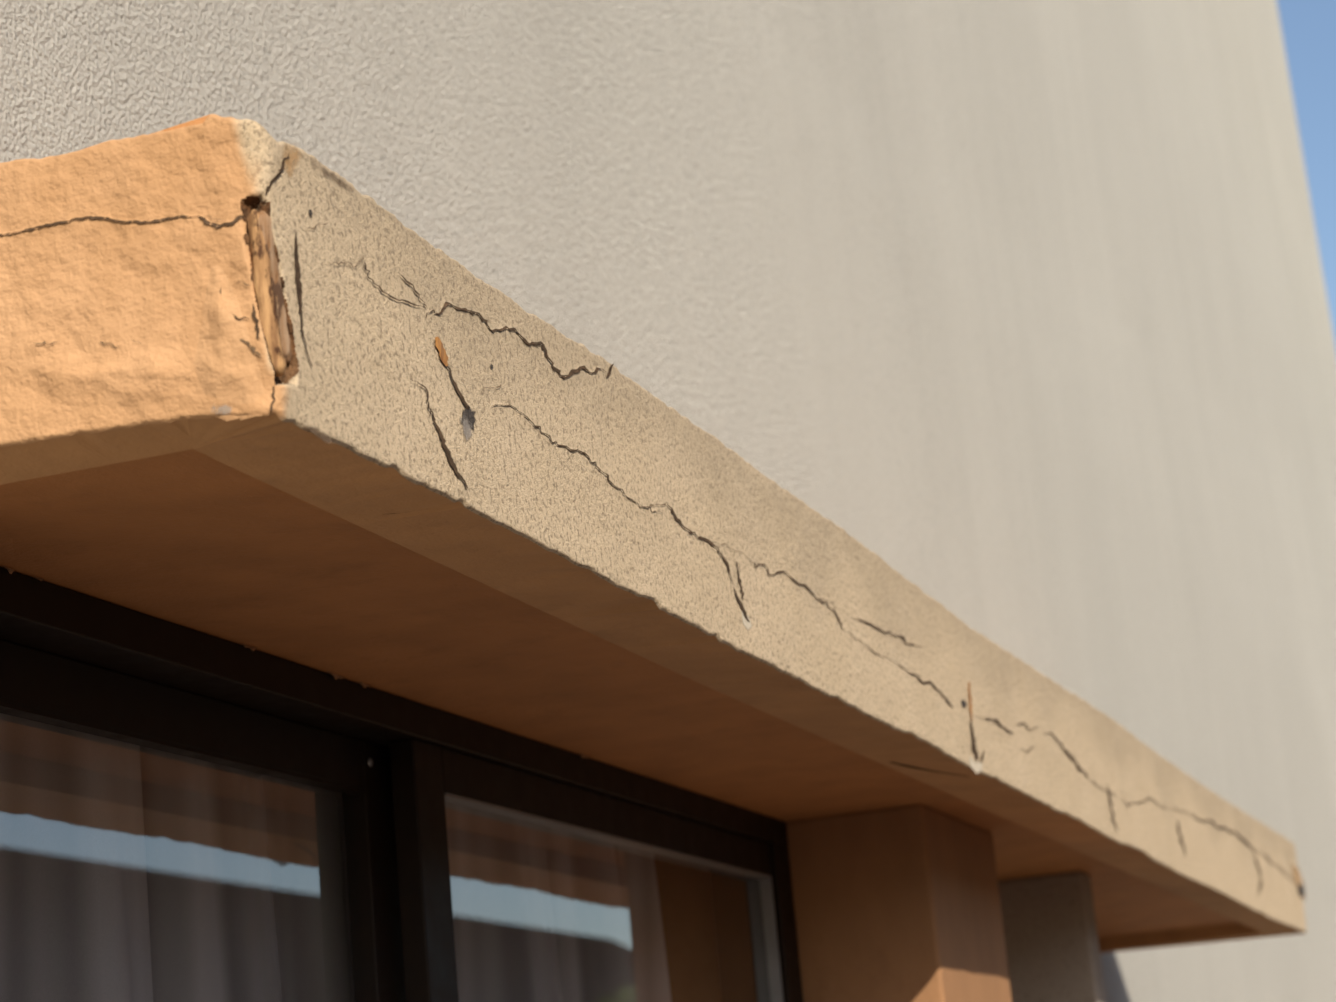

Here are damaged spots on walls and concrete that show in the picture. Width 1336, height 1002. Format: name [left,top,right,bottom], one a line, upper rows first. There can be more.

crack [0,154,290,411]
crack [295,223,614,379]
crack [416,381,468,488]
crack [487,385,1292,895]